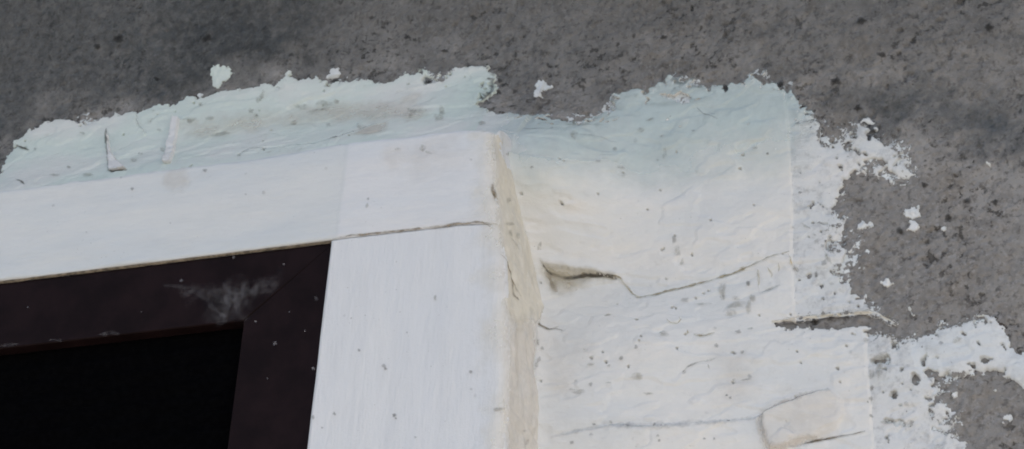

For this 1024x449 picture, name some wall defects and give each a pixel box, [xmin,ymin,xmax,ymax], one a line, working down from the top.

peeling [0,64,499,191]
peeling [638,69,770,105]
crack [612,256,792,297]
peeling [475,83,1024,449]